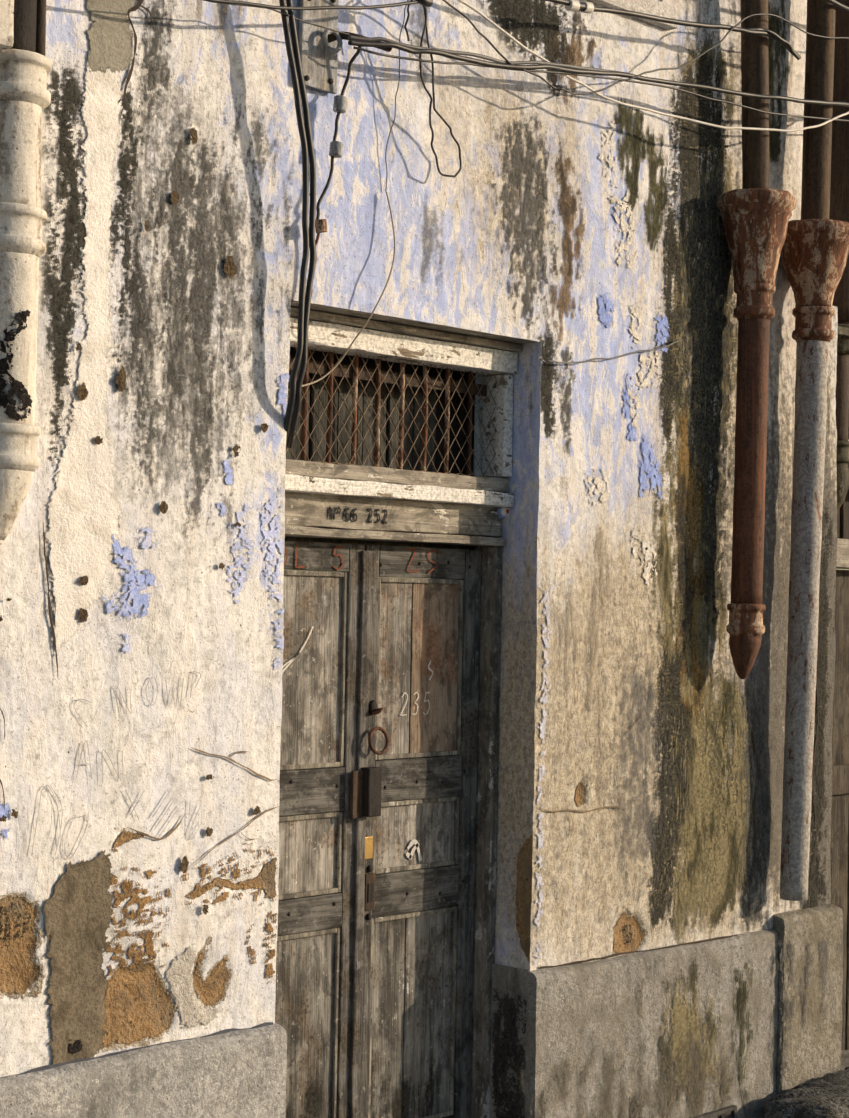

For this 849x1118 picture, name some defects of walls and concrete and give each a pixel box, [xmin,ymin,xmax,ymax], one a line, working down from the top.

peeling [0,310,32,421]
mould [42,66,88,472]
water stain [109,0,292,521]
water stain [491,113,585,453]
water stain [552,0,774,944]
crack [43,525,58,676]
peeling [102,526,162,653]
spalling [0,892,45,1001]
crack [1,1022,273,1078]
crack [130,814,185,840]
spalling [100,828,232,1052]
crack [182,747,279,984]